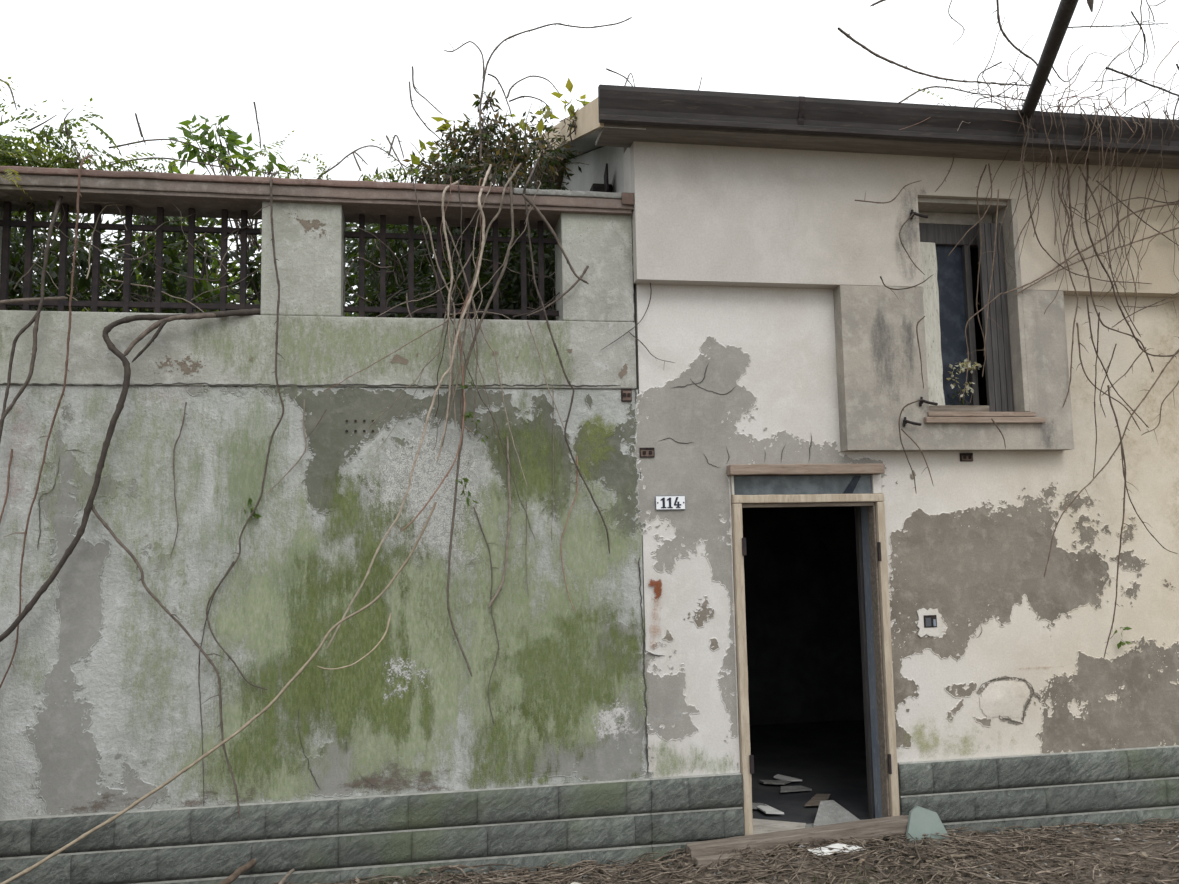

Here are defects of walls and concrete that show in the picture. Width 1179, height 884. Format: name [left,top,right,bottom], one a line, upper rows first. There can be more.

peeling [23,402,173,816]
peeling [154,335,916,784]
corrosion [648,579,662,614]
peeling [888,481,1149,749]
damp [343,763,449,793]
damp [594,699,638,741]
crack [979,677,1040,723]
peeling [944,635,1179,754]